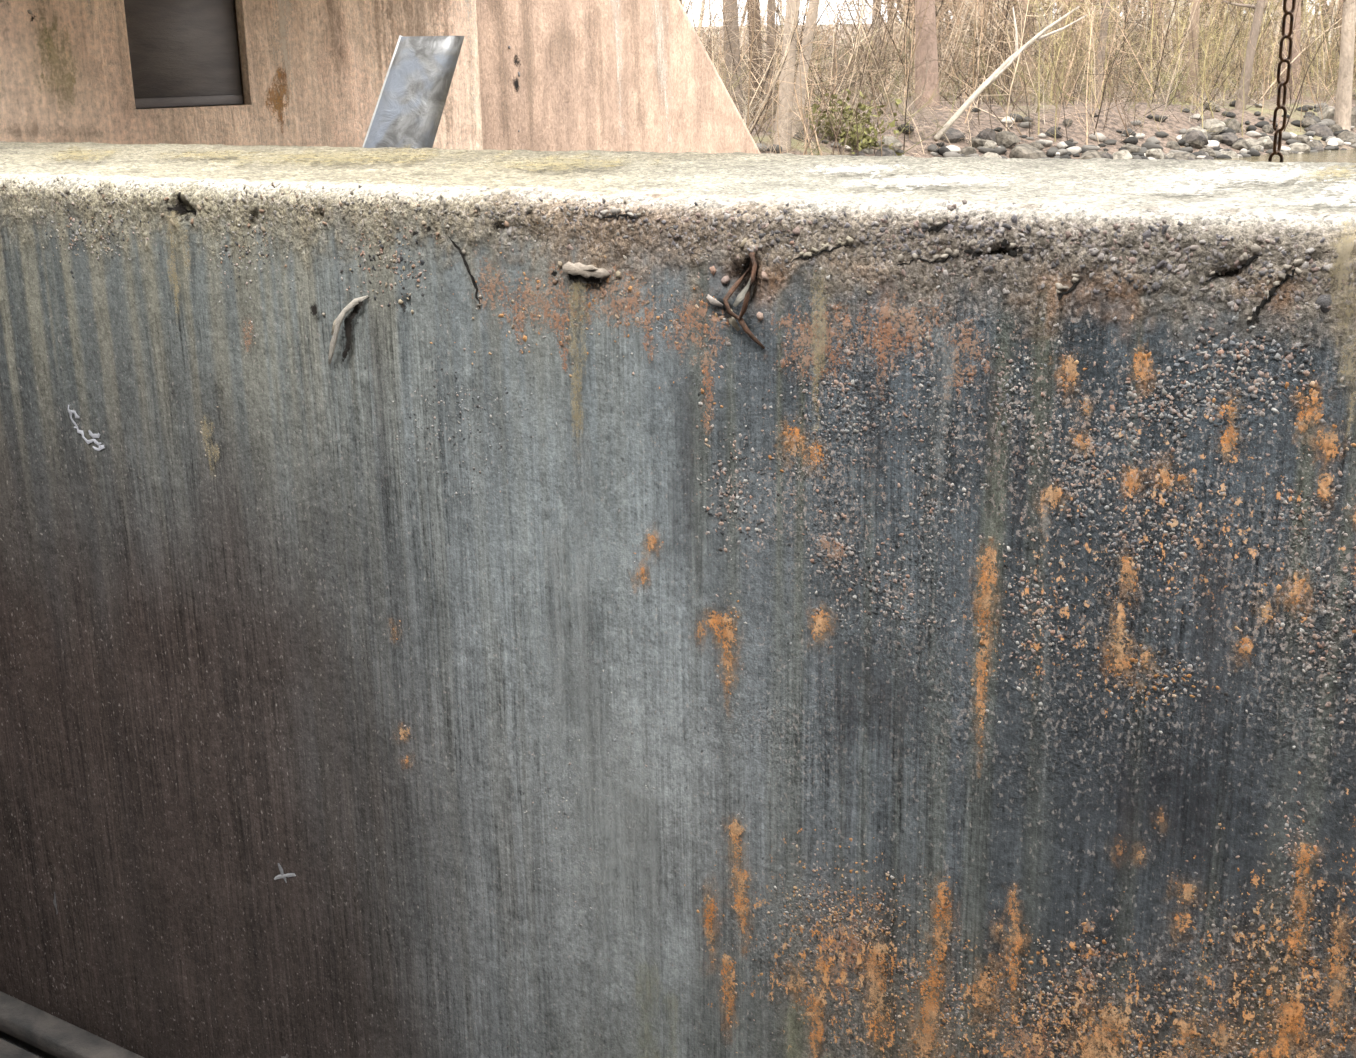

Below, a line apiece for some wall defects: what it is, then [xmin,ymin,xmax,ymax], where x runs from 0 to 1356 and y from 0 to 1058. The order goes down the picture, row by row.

crack [448,236,482,309]
rust [472,240,742,448]
rust [765,265,1010,418]
rust [1058,340,1109,458]
rust [1125,348,1163,391]
crack [1205,243,1302,325]
rust [947,370,1356,754]
rust [694,593,747,695]
rust [697,813,1356,1058]